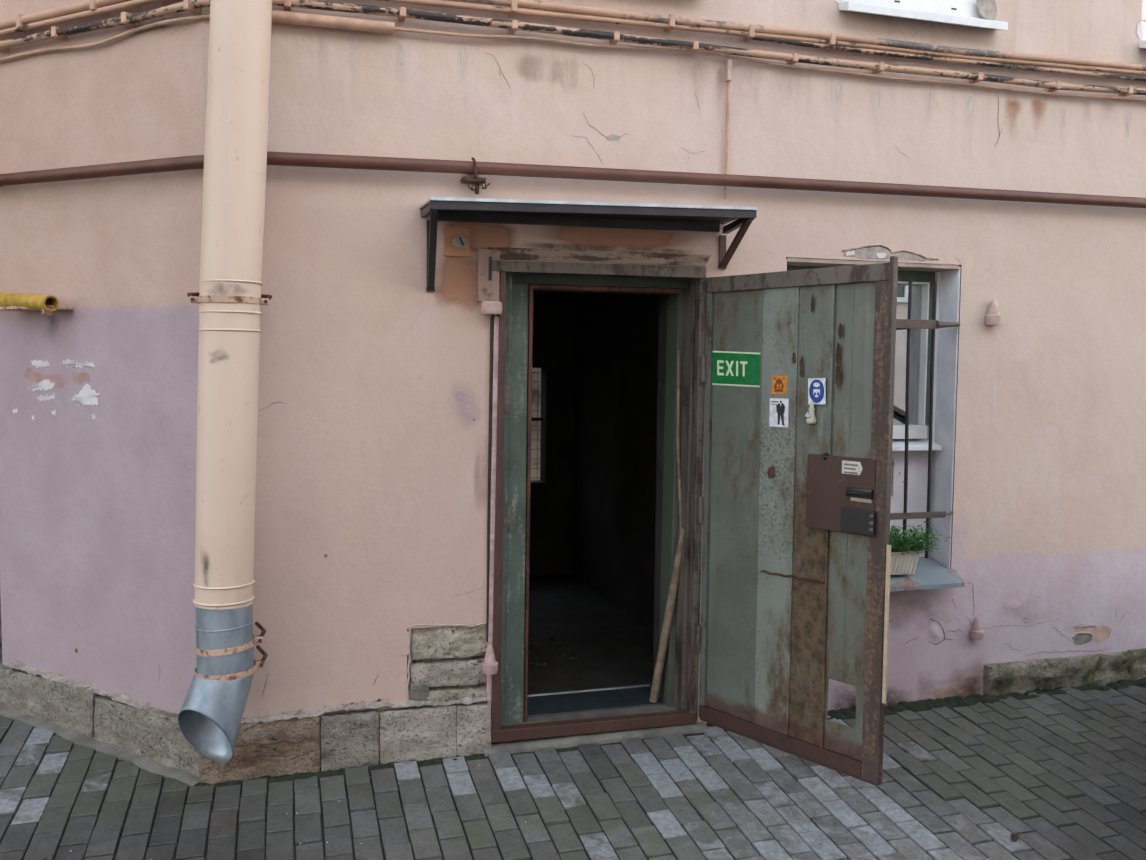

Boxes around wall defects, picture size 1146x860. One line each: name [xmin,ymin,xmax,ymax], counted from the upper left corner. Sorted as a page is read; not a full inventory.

spalling [842,244,939,261]
peeling [24,359,100,419]
crack [889,582,1109,656]
spalling [1071,625,1112,645]